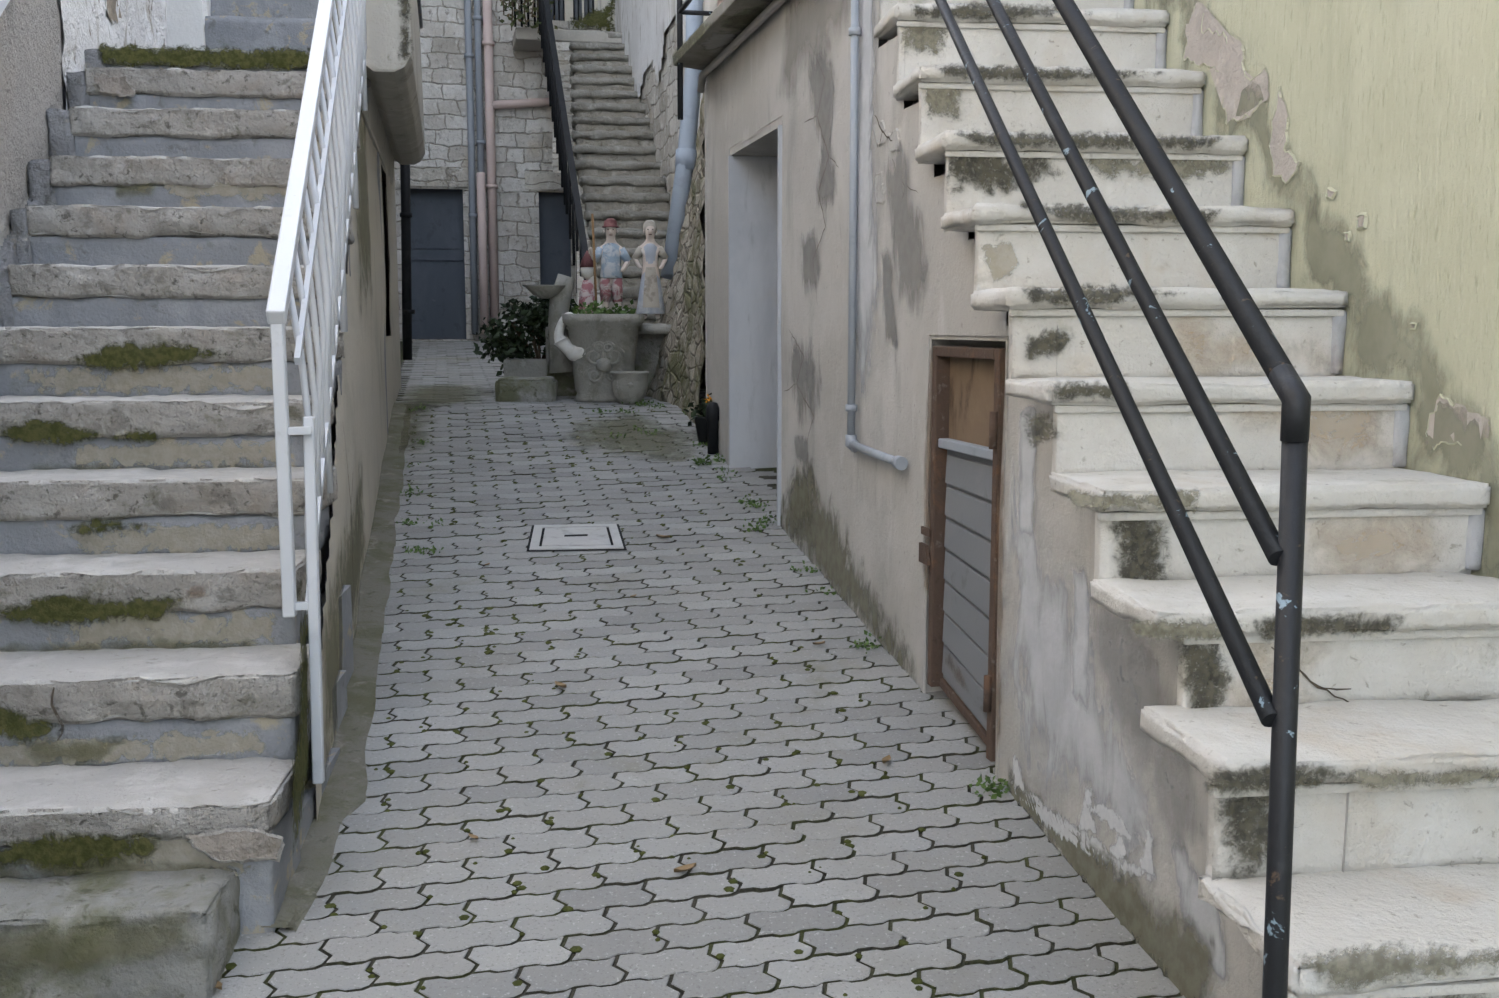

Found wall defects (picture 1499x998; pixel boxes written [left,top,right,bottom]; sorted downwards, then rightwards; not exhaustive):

peeling [105,0,122,25]
peeling [1183,2,1302,184]
leakage [785,0,877,391]
peeling [1425,393,1490,452]
leakage [790,465,815,530]
crack [1271,647,1351,702]